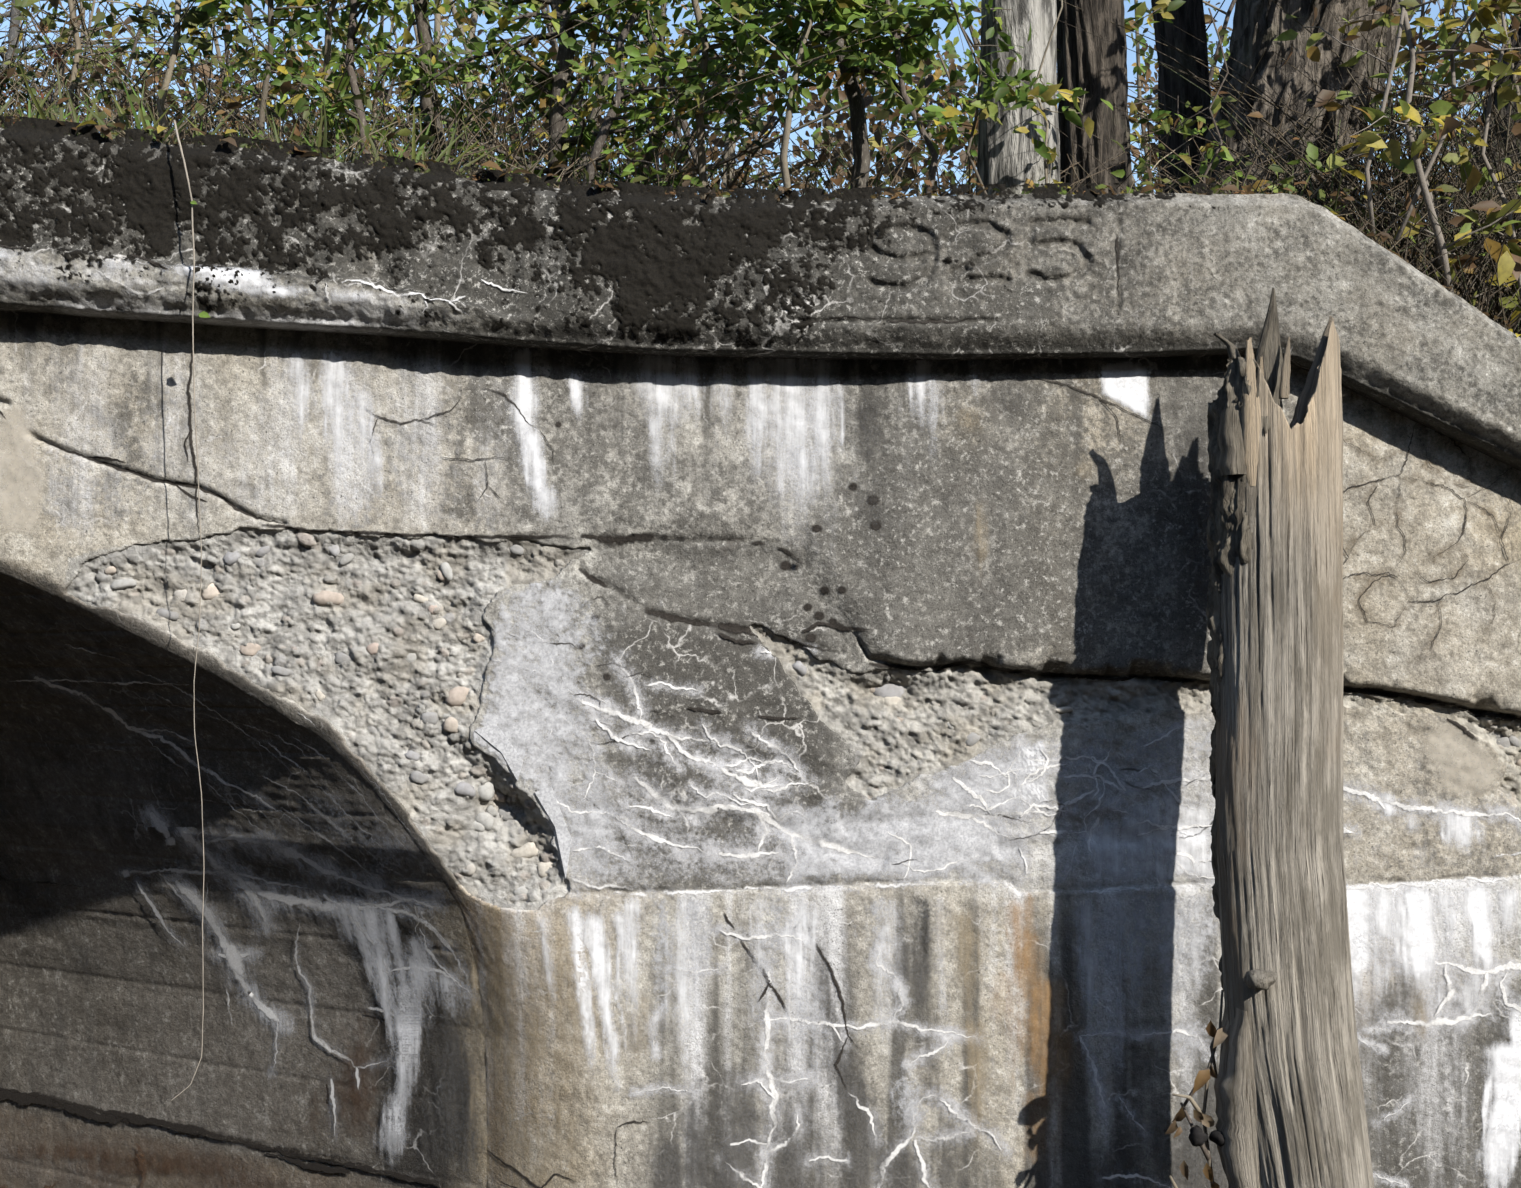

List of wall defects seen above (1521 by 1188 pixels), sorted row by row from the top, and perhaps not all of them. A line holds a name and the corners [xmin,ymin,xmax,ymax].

crack [1343,423,1511,647]
spalling [67,527,617,910]
crack [0,324,1217,1188]
spalling [749,586,1212,799]
spalling [1343,692,1521,806]
damp [335,902,477,1173]
damp [568,731,1225,1188]
damp [1346,886,1517,1014]
damp [1482,1009,1521,1188]